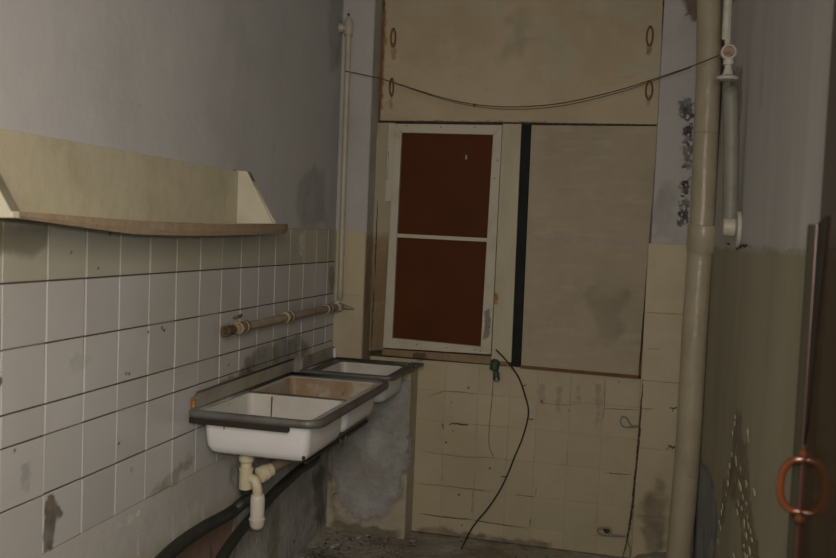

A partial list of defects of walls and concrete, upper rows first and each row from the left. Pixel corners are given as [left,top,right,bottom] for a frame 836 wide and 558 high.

peeling [681,0,697,20]
peeling [231,381,412,558]
crack [603,378,677,558]
damp [45,495,62,550]
peeling [175,506,250,558]